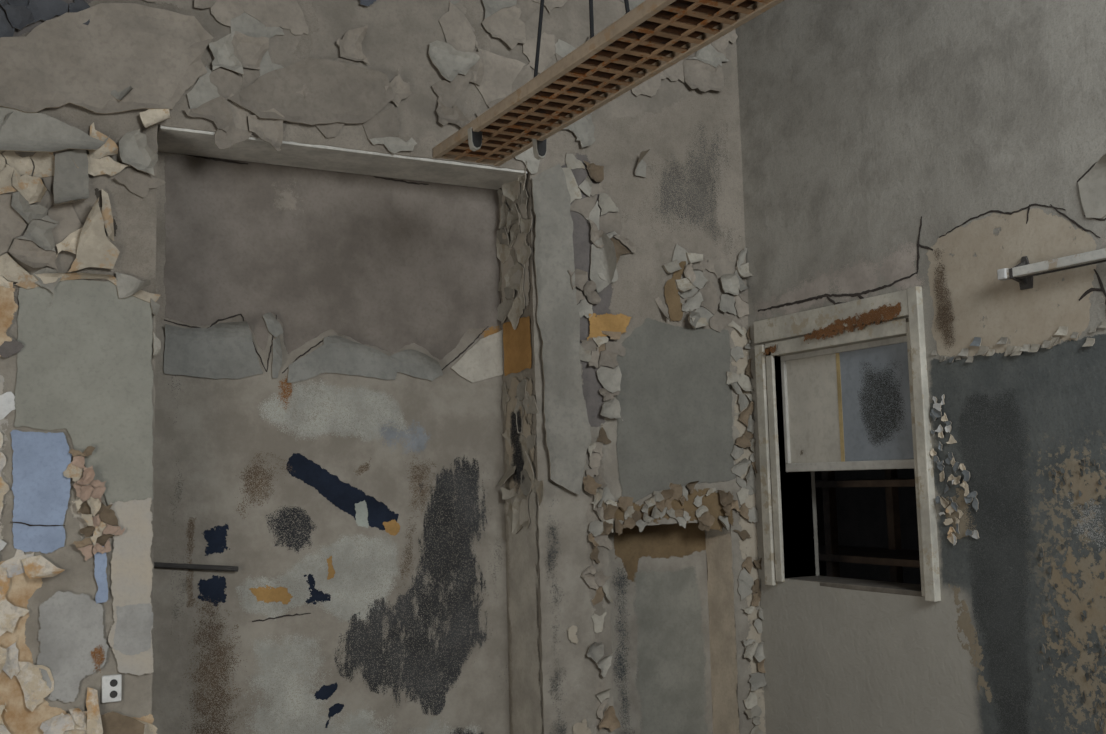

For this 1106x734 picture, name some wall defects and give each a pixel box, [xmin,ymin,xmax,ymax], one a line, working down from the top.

peeling [0,375,158,734]
flaking render [0,0,645,534]
peeling [559,30,1106,734]
rust [804,302,901,344]
crack [758,203,1106,312]
water stain [955,388,1035,734]
crack [1077,163,1096,182]